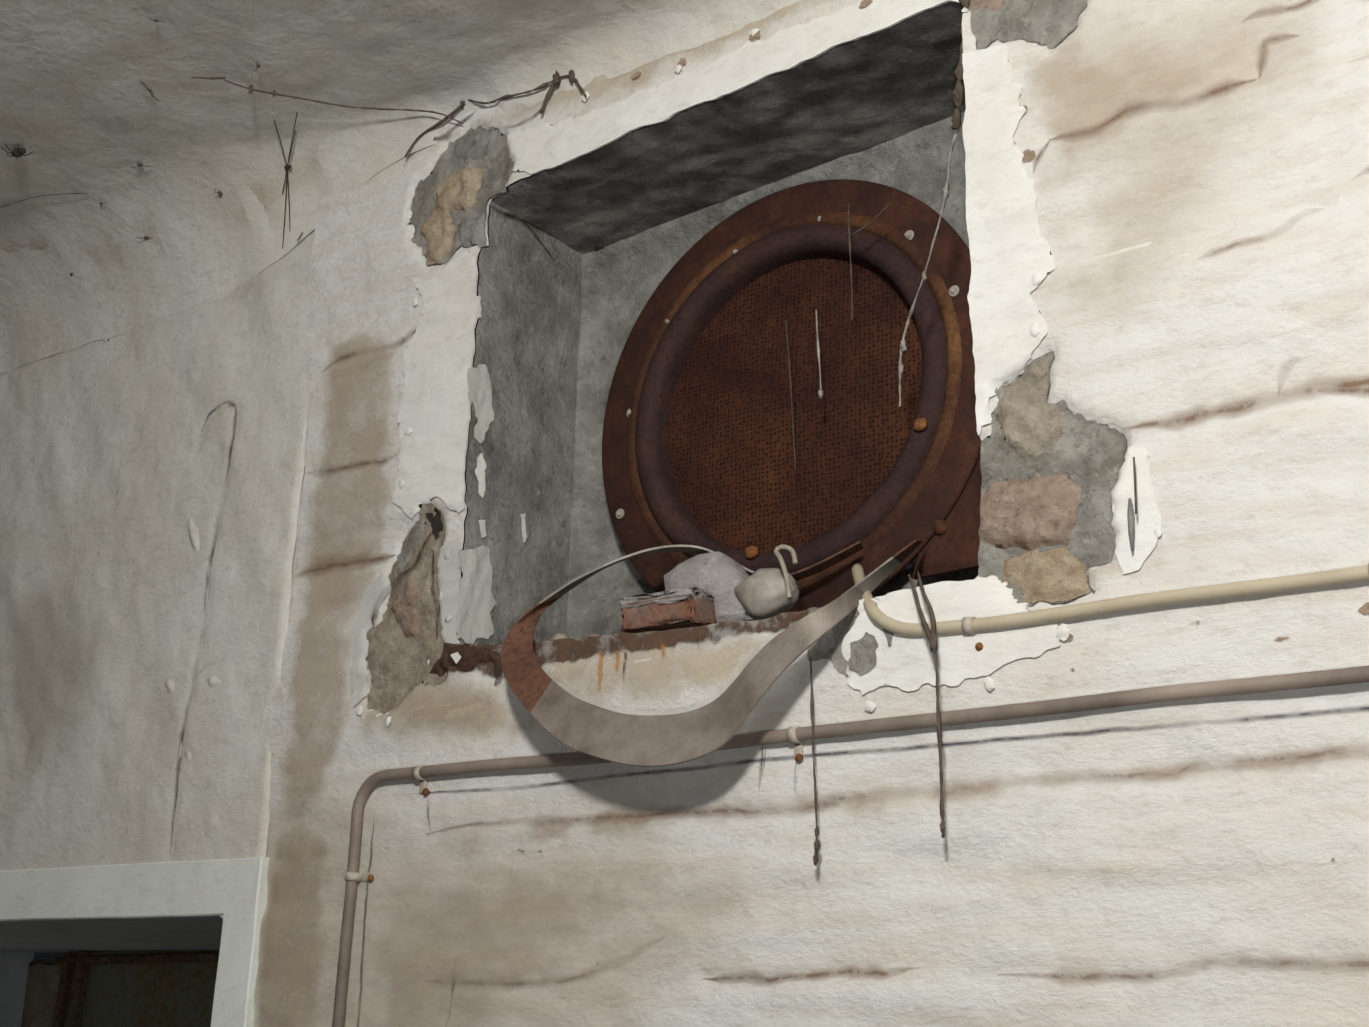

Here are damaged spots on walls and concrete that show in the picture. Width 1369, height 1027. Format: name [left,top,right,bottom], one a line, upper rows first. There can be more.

crack [1209,0,1311,95]
flaking render [348,0,1162,727]
crack [1339,379,1369,393]
corrosion [913,418,928,431]
crack [1123,402,1253,430]
damp [290,338,385,796]
corrosion [745,546,758,559]
corrosion [443,642,505,685]
corrosion [533,607,822,689]
crack [1241,707,1369,720]
crack [736,728,1142,764]
crack [357,826,374,1027]